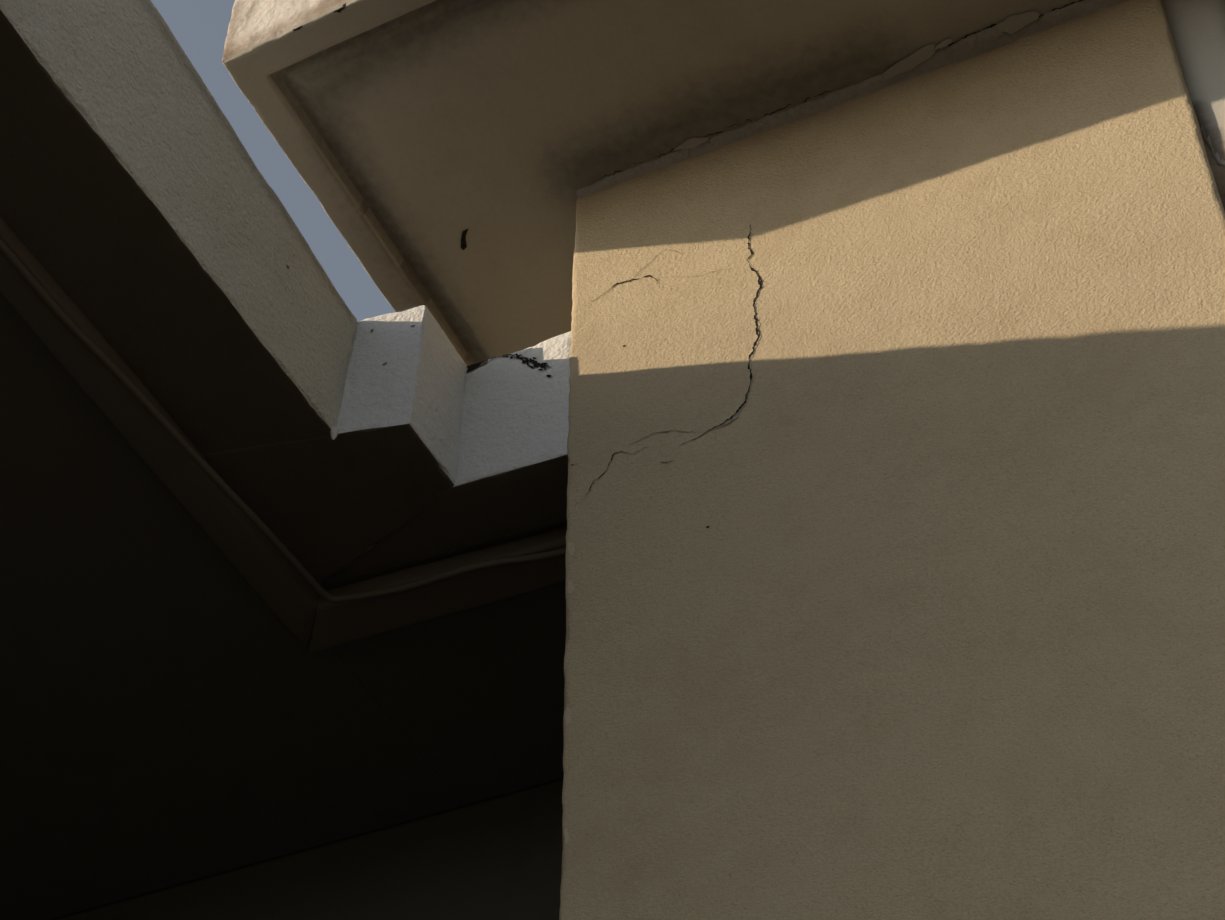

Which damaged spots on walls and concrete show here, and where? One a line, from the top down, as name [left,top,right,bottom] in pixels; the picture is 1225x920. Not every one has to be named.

crack [571,225,763,503]